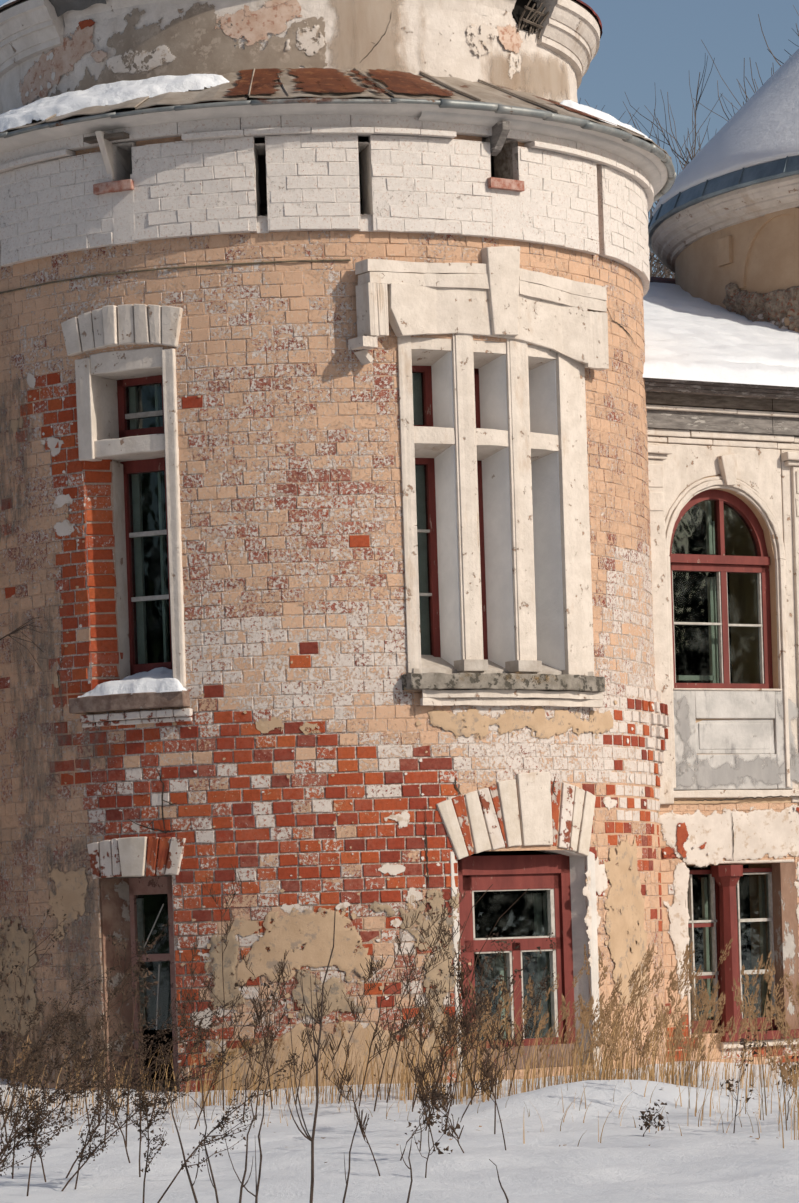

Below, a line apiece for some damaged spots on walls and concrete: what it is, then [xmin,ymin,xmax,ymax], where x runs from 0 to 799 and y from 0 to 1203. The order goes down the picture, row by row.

peeling [19,0,327,105]
rust [224,68,455,103]
spalling [467,0,550,79]
peeling [0,371,471,1092]
peeling [416,706,614,739]
peeling [581,784,799,1064]